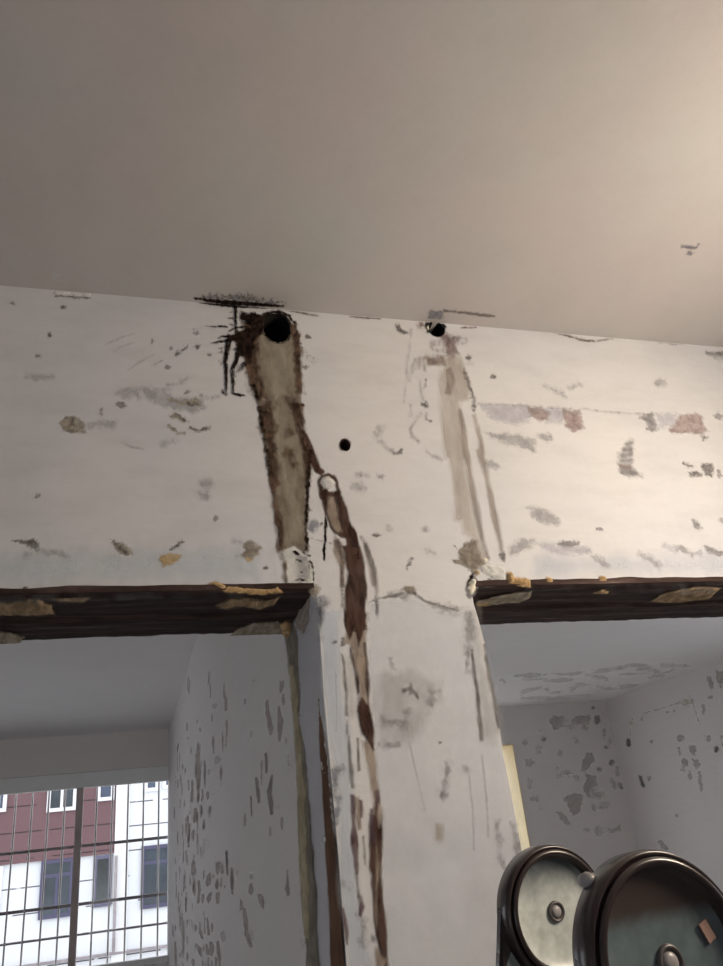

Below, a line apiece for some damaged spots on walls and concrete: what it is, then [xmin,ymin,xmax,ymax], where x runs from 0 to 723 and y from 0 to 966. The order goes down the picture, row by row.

crack [199,302,316,316]
spalling [60,417,85,433]
peeling [168,391,208,434]
peeling [483,405,582,432]
peeling [641,414,706,438]
peeling [619,442,638,476]
spalling [683,463,722,477]
spalling [114,543,131,555]
corrosion [211,305,388,966]
peeling [244,753,283,835]
peeling [556,753,623,824]
peeling [172,690,264,966]